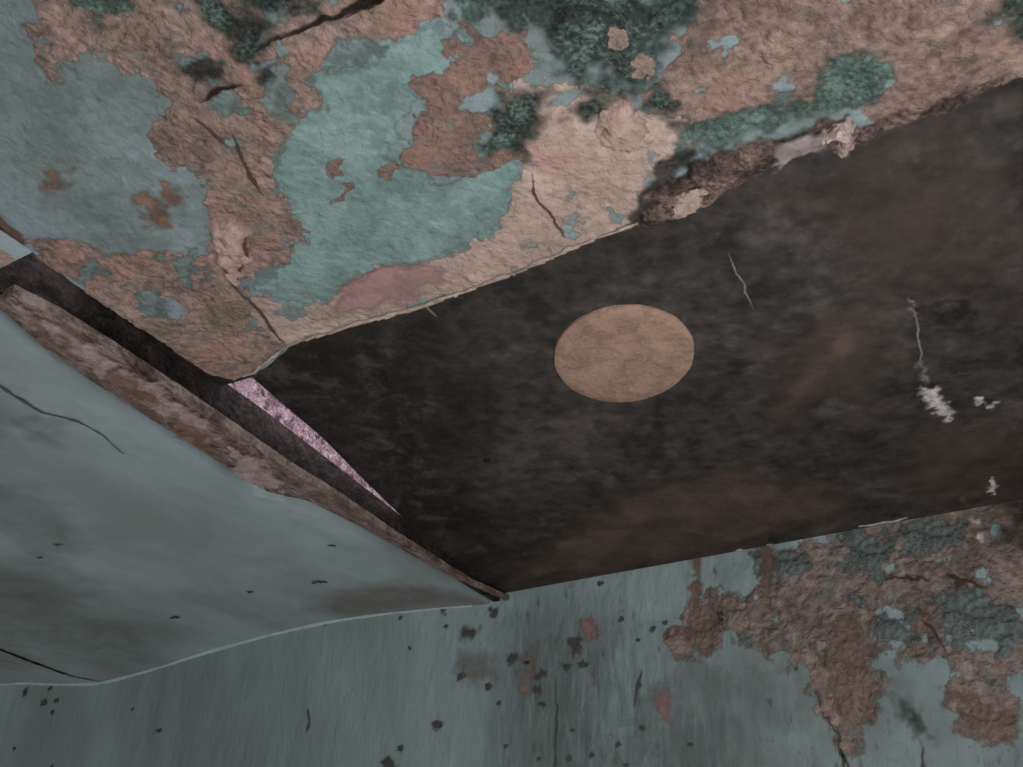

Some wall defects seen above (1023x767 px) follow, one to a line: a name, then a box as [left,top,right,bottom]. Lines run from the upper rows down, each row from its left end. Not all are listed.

crack [255,0,385,52]
peeling [19,0,1023,380]
peeling [0,250,13,267]
crack [0,385,124,454]
peeling [663,500,1023,759]
crack [815,692,849,767]